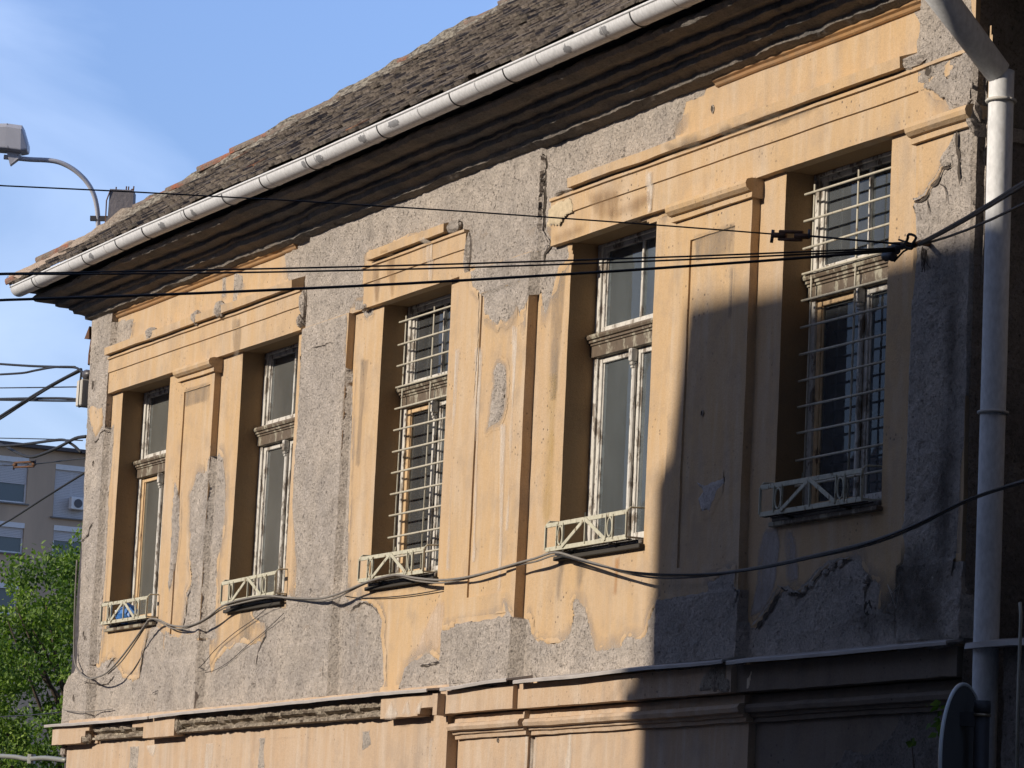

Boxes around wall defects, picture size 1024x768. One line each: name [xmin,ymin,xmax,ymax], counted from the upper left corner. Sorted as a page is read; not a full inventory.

flaking render [913,0,989,110]
flaking render [62,87,707,768]
flaking render [399,117,988,693]